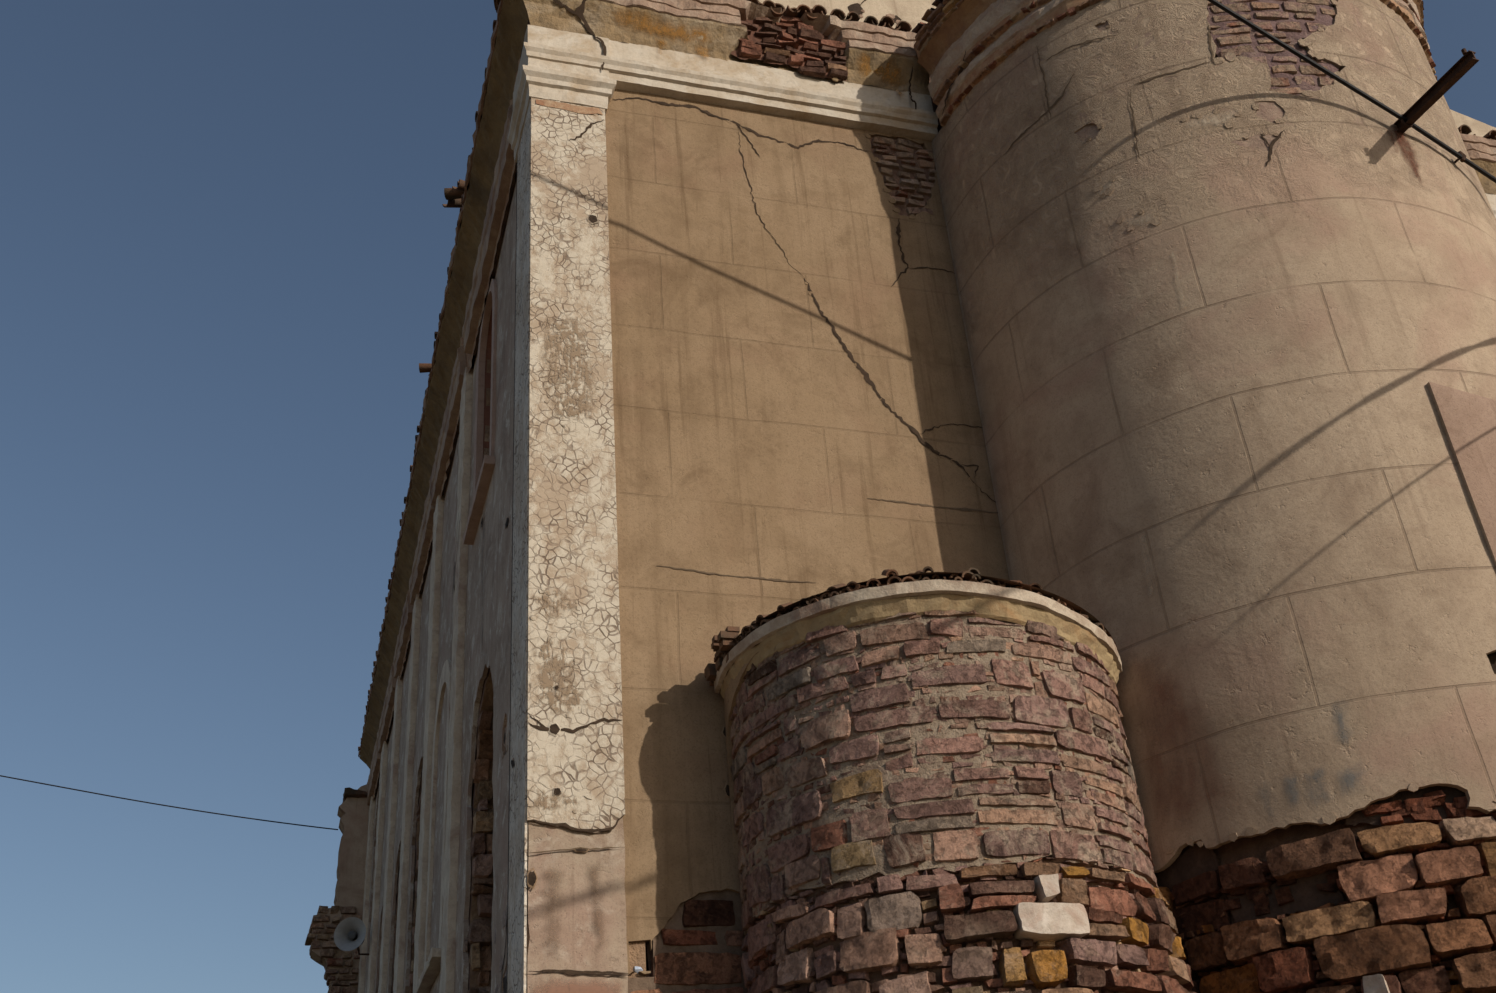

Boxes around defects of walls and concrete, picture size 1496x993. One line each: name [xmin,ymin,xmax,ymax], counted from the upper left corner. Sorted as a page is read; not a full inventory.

flaking render [738,15,848,79]
crack [1004,35,1116,155]
crack [1130,25,1214,159]
flaking render [1181,0,1341,151]
flaking render [866,134,936,219]
crack [553,0,998,513]
crack [528,714,622,733]
flaking render [1322,812,1337,825]